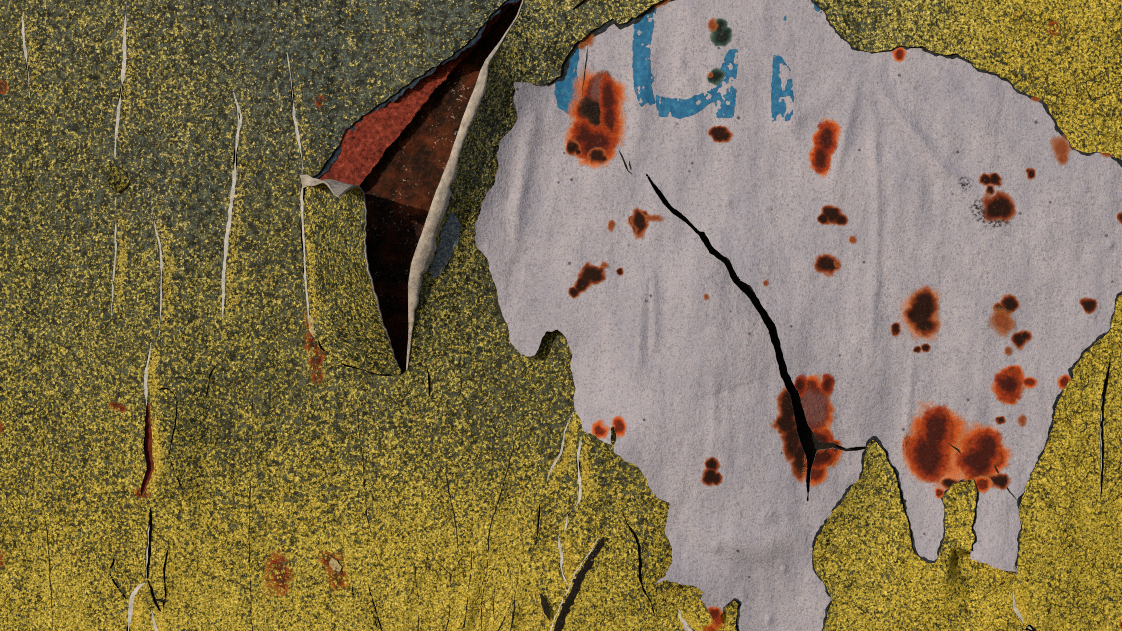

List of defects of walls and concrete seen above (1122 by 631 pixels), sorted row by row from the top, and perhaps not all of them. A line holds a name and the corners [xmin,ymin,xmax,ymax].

peeling [300,175,319,188]
corrosion [566,73,624,167]
corrosion [608,208,662,238]
corrosion [809,120,840,176]
corrosion [971,173,1016,227]
corrosion [568,262,623,298]
crack [619,151,866,501]
peeling [475,0,1122,631]
corrosion [891,286,939,353]
corrosion [772,374,843,486]
corrosion [903,294,1037,499]
crack [414,412,695,631]